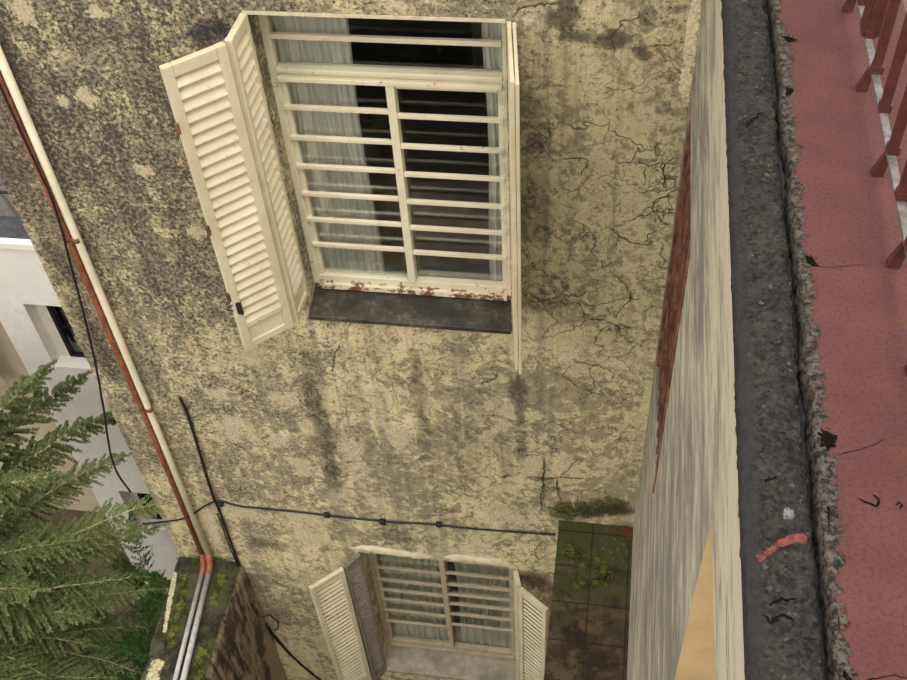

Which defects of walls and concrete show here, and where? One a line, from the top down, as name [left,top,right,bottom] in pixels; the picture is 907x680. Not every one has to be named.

crack [512,2,562,17]
crack [606,158,681,247]
crack [575,269,643,329]
crack [526,454,580,513]
water stain [224,581,237,661]
water stain [253,616,271,680]